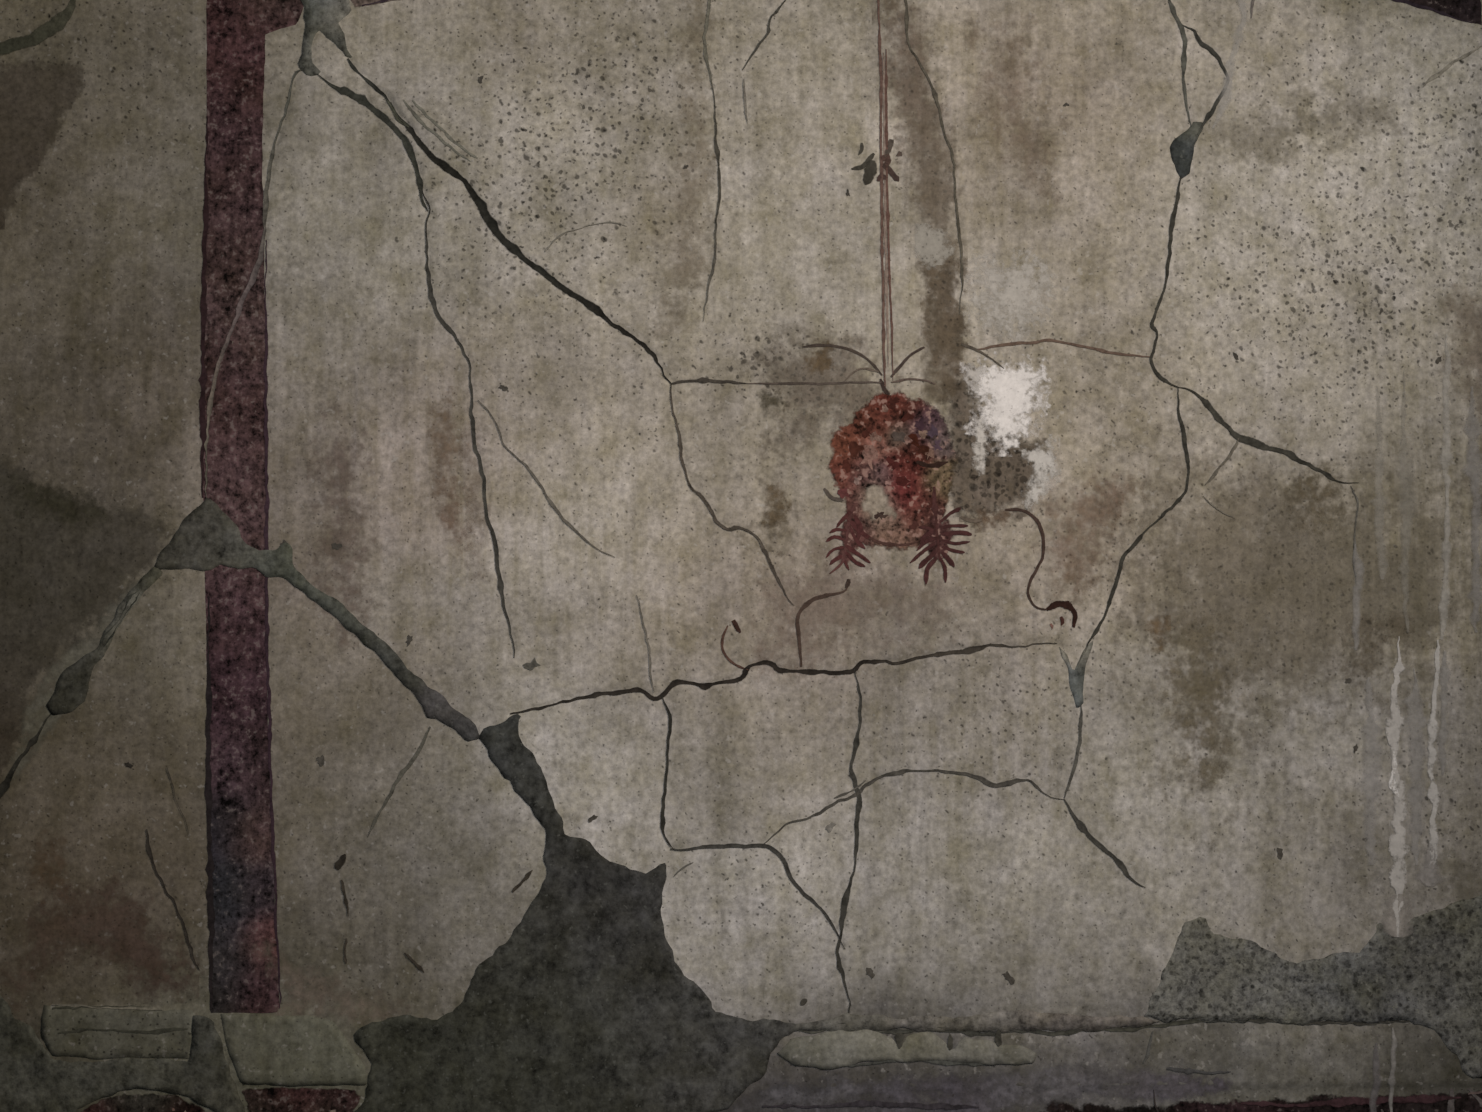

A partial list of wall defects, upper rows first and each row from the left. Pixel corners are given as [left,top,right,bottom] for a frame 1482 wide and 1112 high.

crack [204,58,794,658]
crack [703,0,786,321]
crack [904,0,964,314]
water stain [887,1,1057,526]
crack [1168,0,1229,135]
crack [1423,46,1481,87]
crack [0,713,51,798]
crack [99,591,139,650]
crack [335,726,431,963]
crack [404,953,424,972]
crack [510,177,1410,1112]
water stain [1119,297,1482,938]